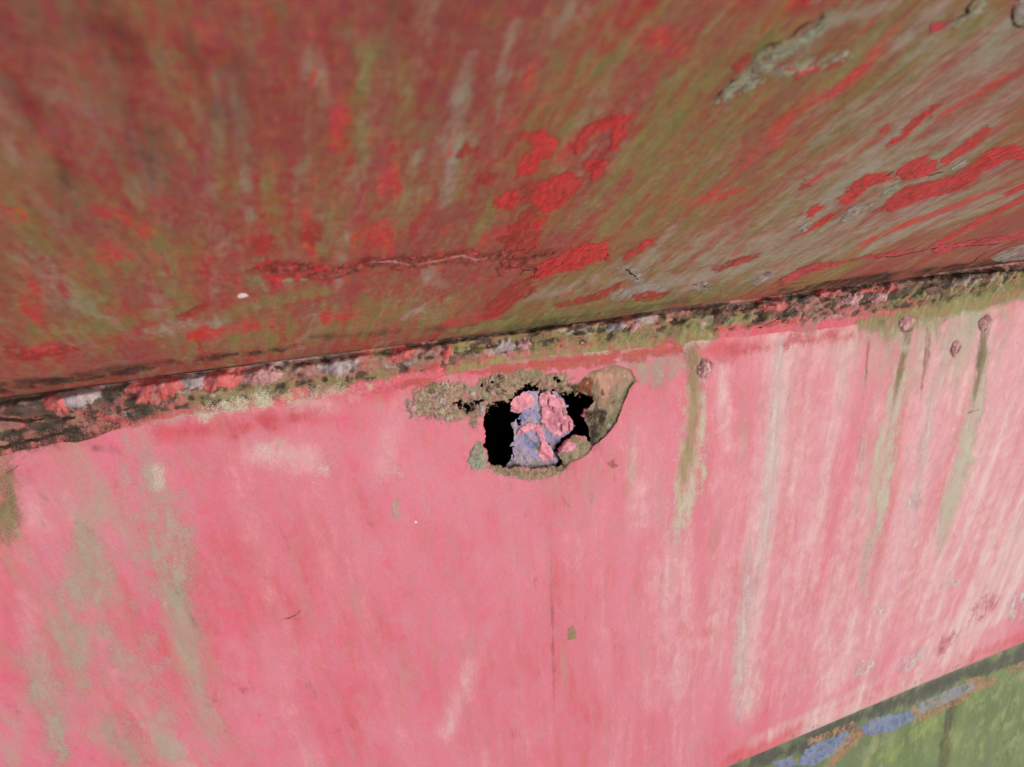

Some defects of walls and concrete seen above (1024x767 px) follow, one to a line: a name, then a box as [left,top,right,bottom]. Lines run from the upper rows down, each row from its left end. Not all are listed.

peeling [725,0,855,83]
peeling [875,102,945,147]
crack [244,220,561,289]
peeling [482,111,670,321]
peeling [691,251,762,293]
peeling [751,267,812,286]
peeling [795,124,1024,234]
peeling [992,244,1024,262]
spalling [342,336,703,468]
damp [849,283,1024,541]
damp [730,335,790,723]